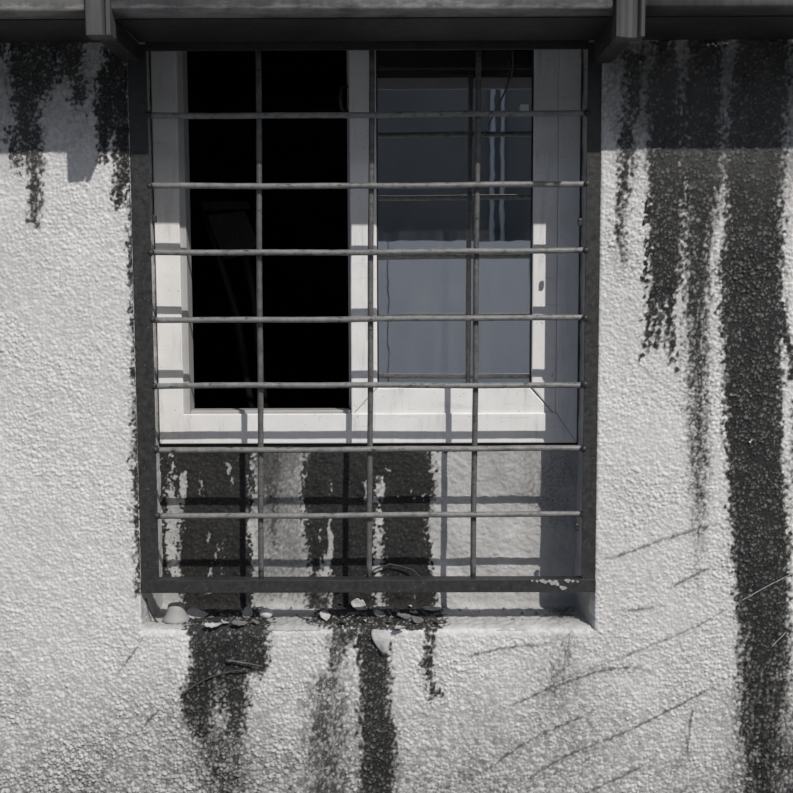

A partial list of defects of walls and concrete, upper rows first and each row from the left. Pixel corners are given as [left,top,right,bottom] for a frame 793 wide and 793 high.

leakage [0,43,140,597]
leakage [159,444,438,577]
leakage [610,39,793,793]
leakage [179,593,276,793]
leakage [304,592,452,793]